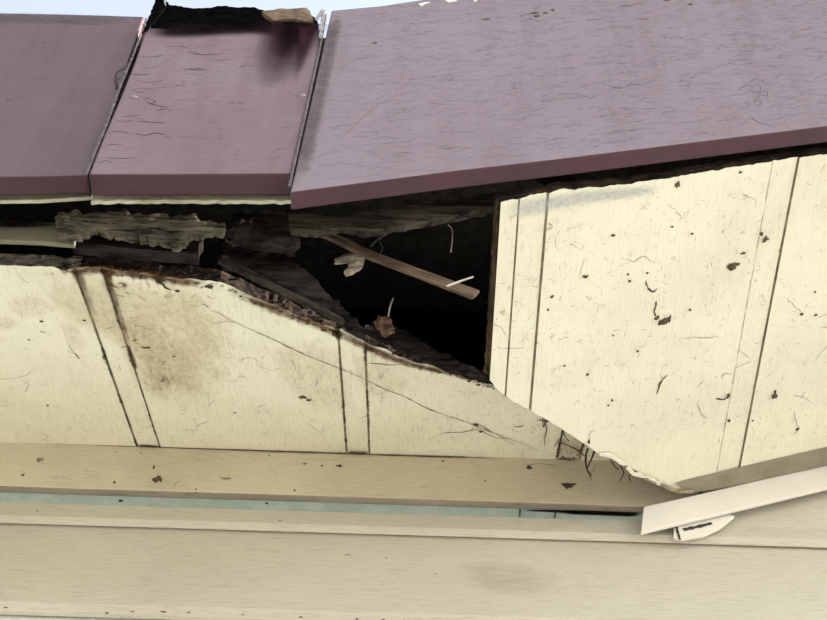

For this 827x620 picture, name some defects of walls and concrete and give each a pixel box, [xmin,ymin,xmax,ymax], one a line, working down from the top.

crack [2,272,168,441]
leakage [62,267,494,390]
crack [136,166,827,493]
peeling [599,453,694,494]